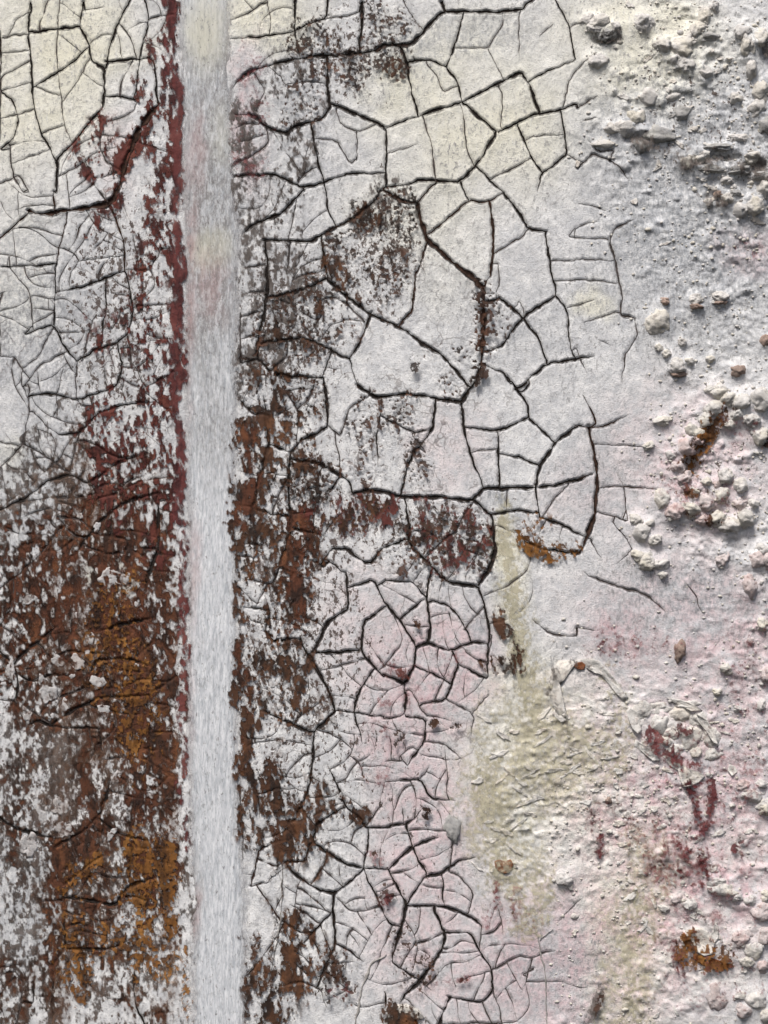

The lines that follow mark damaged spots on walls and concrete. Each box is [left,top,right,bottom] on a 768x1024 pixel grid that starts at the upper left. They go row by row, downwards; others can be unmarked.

crack [0,0,178,1024]
peeling [0,443,188,1024]
corrosion [51,0,194,1022]
peeling [222,184,434,1024]
peeling [376,529,457,590]
crack [230,0,666,1024]
peeling [438,277,514,404]
corrosion [515,511,583,565]
corrosion [656,401,768,527]